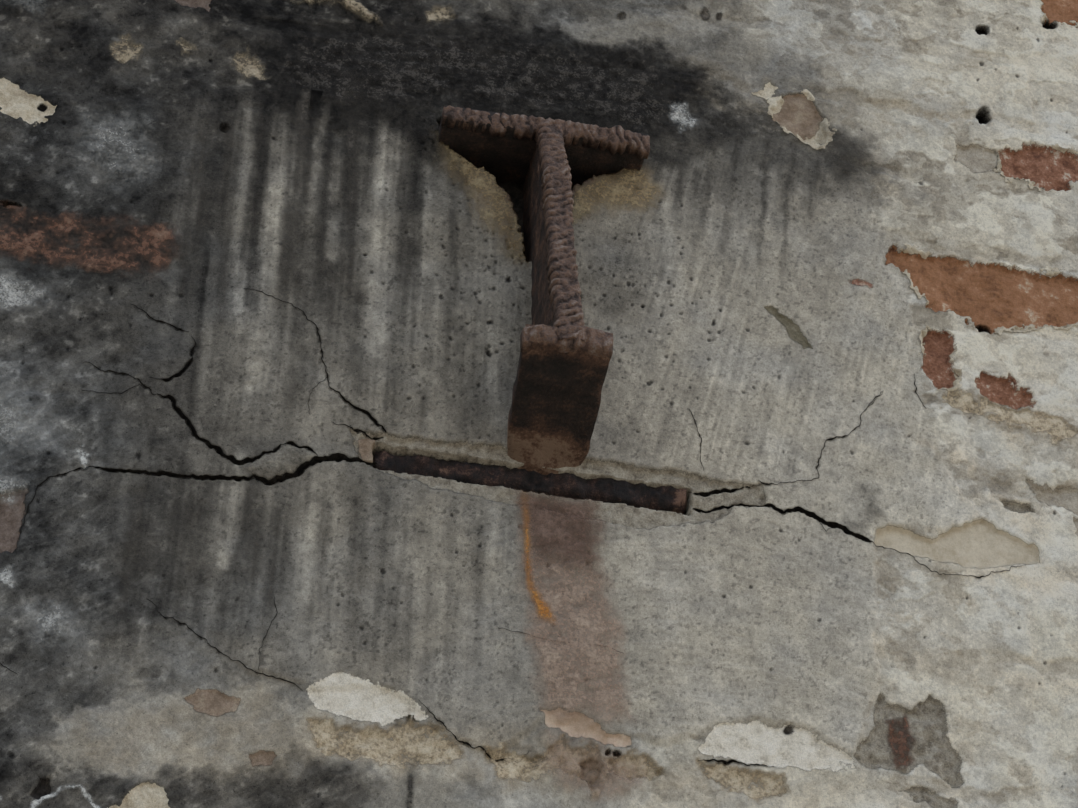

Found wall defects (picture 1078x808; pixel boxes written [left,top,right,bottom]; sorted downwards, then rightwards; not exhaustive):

water stain [279,89,310,300]
rust [447,148,523,257]
rust [572,168,660,222]
water stain [672,103,695,126]
flaking render [954,142,1078,193]
flaking render [885,243,1078,335]
crack [0,288,386,552]
peeling [918,326,1078,444]
crack [689,391,1023,578]
rust [520,497,623,721]
spalling [306,672,463,769]
spalling [696,693,964,808]